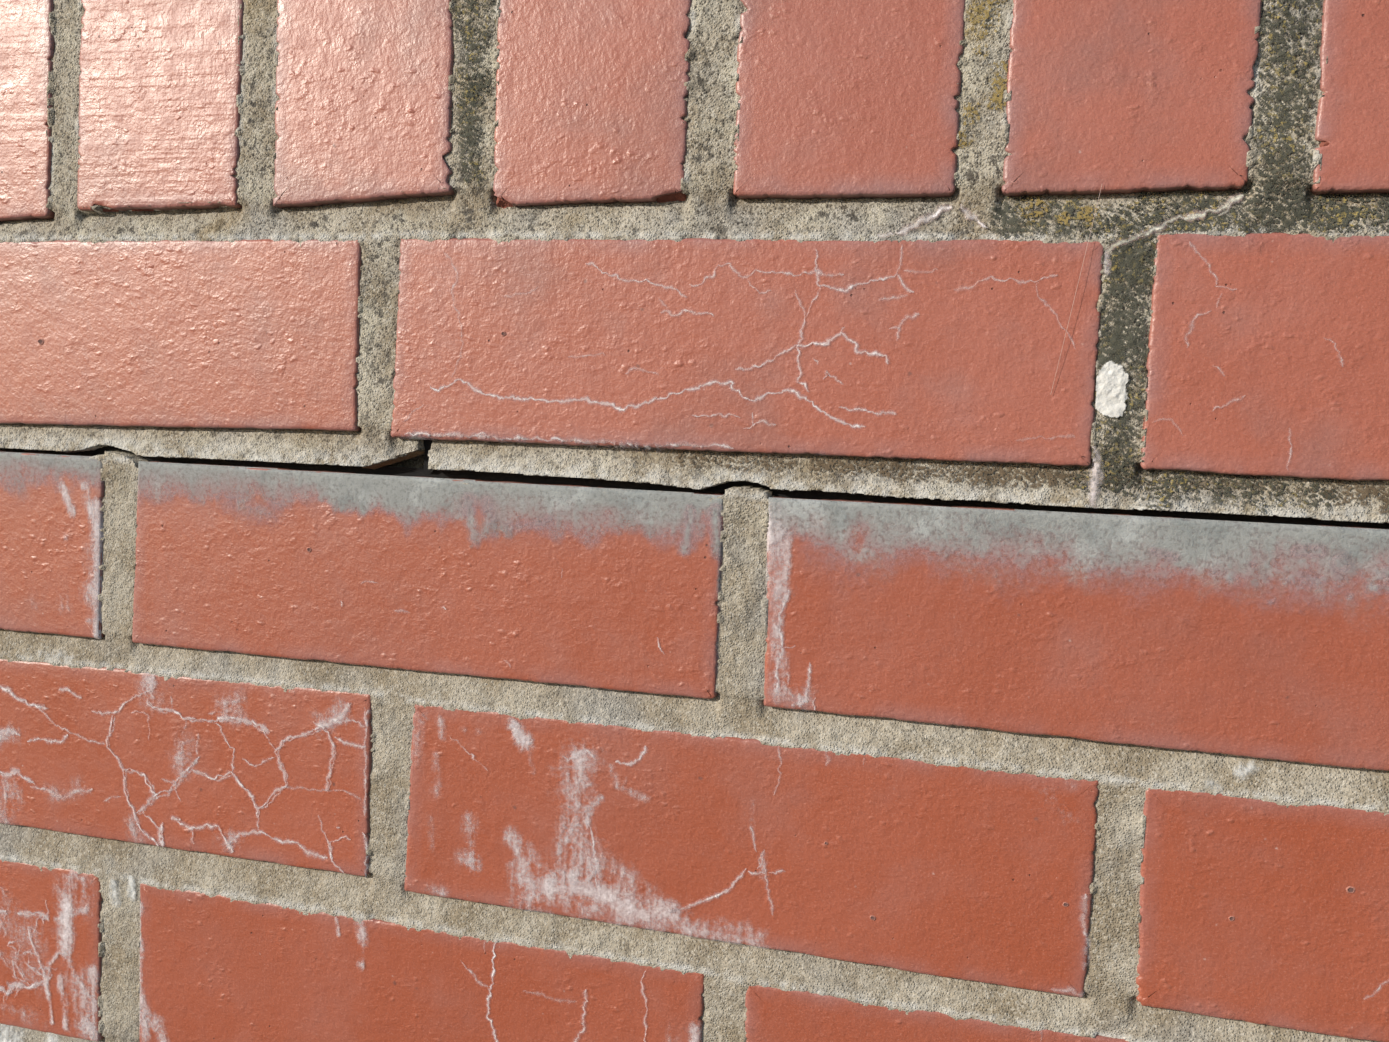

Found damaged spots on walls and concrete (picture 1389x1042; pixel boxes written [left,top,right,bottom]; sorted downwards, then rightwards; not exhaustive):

crack [432,277,904,427]
leakage [0,452,104,639]
leakage [138,461,723,593]
crack [0,438,1389,529]
leakage [669,446,1389,607]
crack [1,687,369,877]
leakage [509,721,532,747]
leakage [507,751,760,948]
crack [0,910,44,994]
crack [470,948,497,1042]